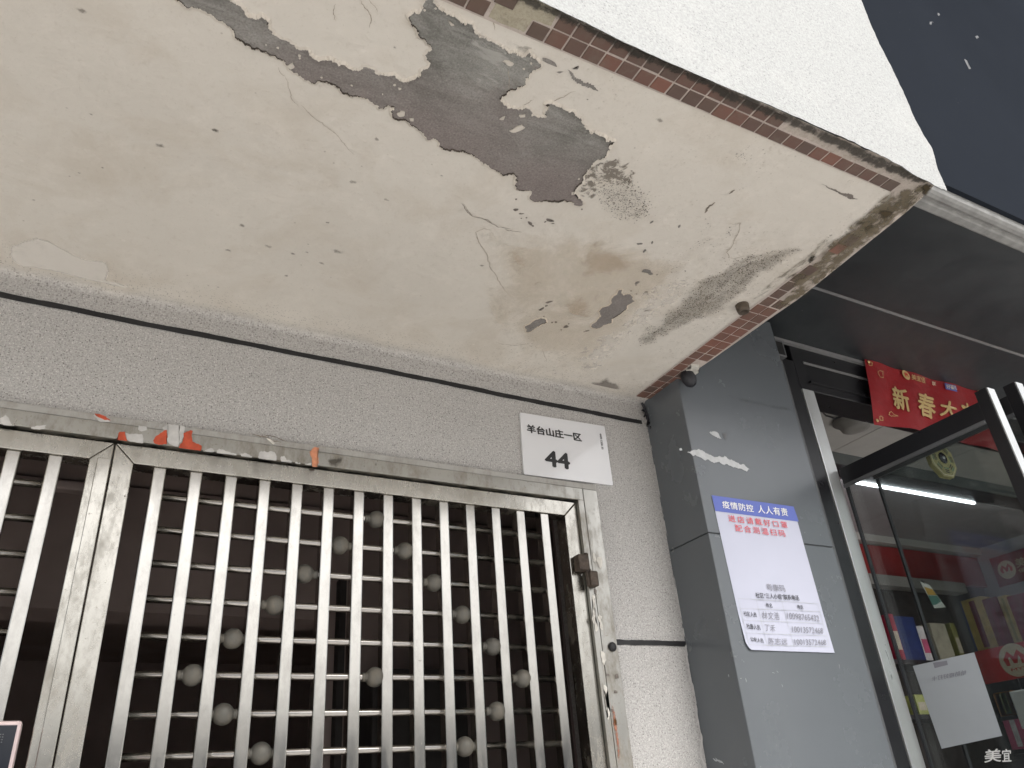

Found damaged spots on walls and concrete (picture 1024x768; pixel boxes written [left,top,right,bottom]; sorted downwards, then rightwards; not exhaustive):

peeling [175,0,653,227]
crack [463,205,518,287]
peeling [523,301,569,333]
peeling [584,269,658,332]
leakage [639,184,931,346]